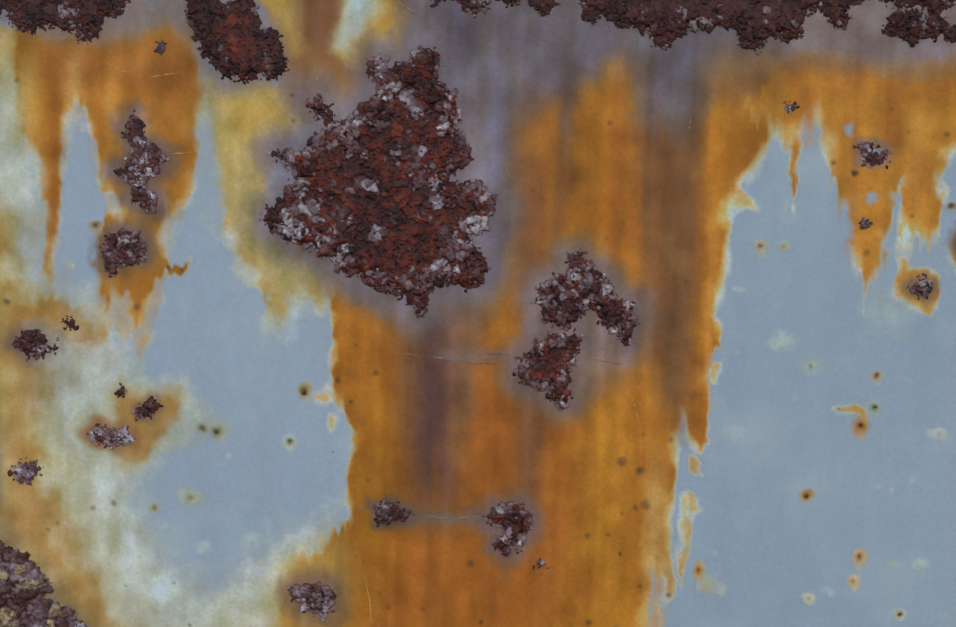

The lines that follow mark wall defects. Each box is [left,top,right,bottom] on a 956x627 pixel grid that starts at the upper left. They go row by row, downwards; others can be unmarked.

corrosion [0,140,350,627]
corrosion [0,0,421,364]
corrosion [188,0,792,627]
corrosion [579,0,865,55]
corrosion [744,0,956,346]